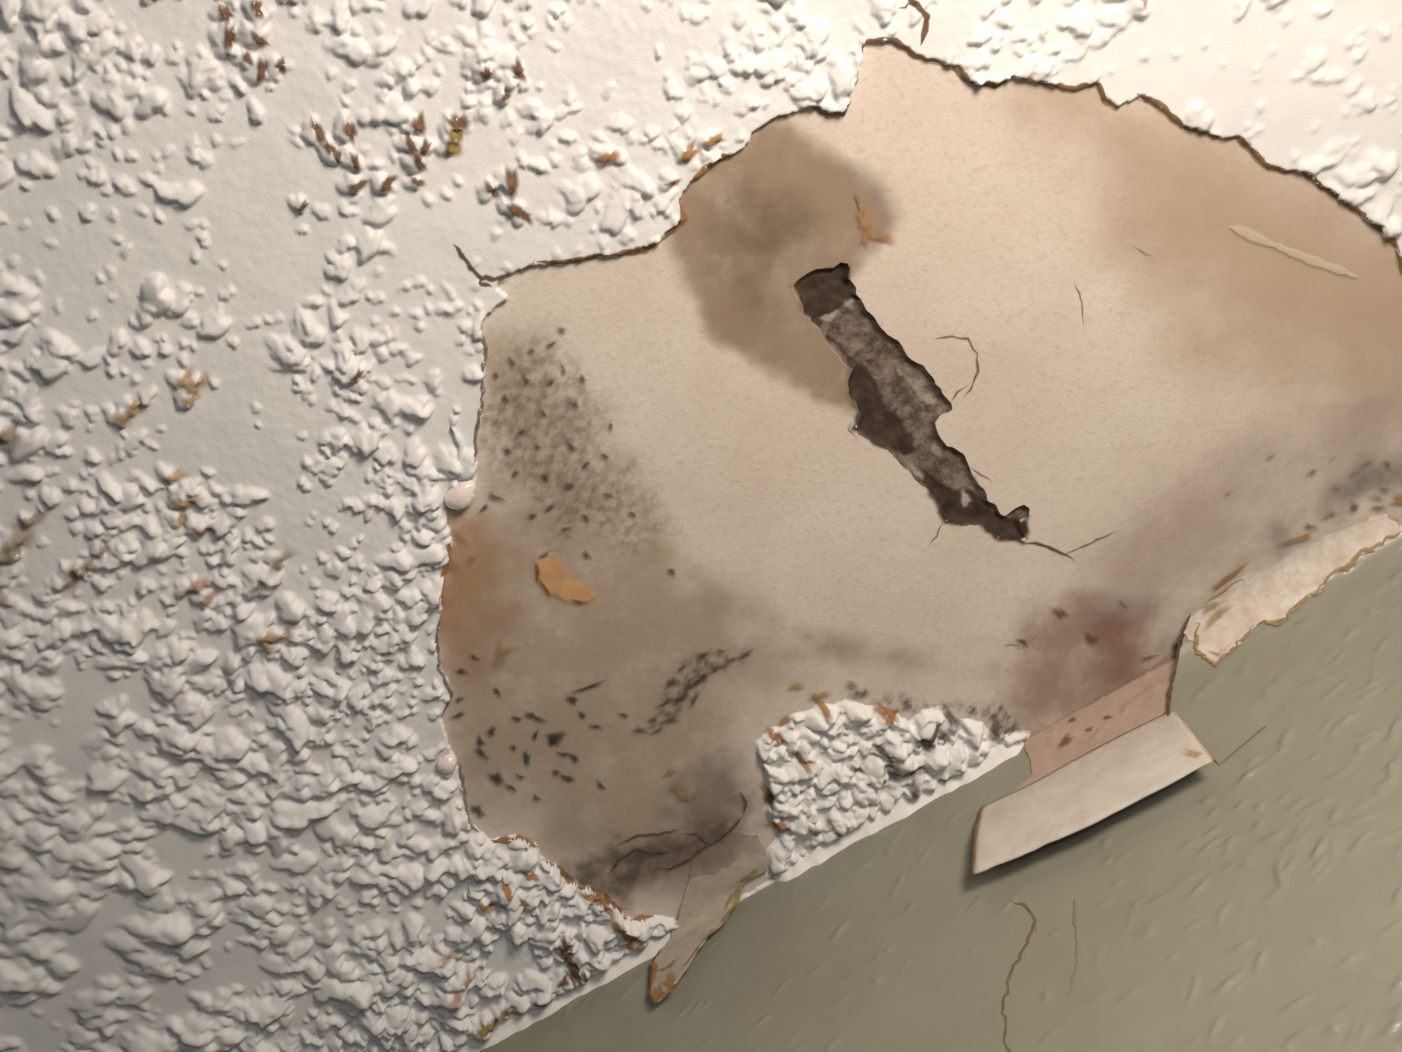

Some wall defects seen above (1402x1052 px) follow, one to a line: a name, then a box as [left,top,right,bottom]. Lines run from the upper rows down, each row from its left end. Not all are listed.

leakage [675,125,888,405]
peeling [435,37,1402,1003]
leakage [477,728,495,758]
leakage [491,713,578,791]
leakage [568,682,600,728]
leakage [636,650,749,733]
leakage [579,771,748,895]
crack [1001,900,1037,1052]
crack [1067,893,1078,996]